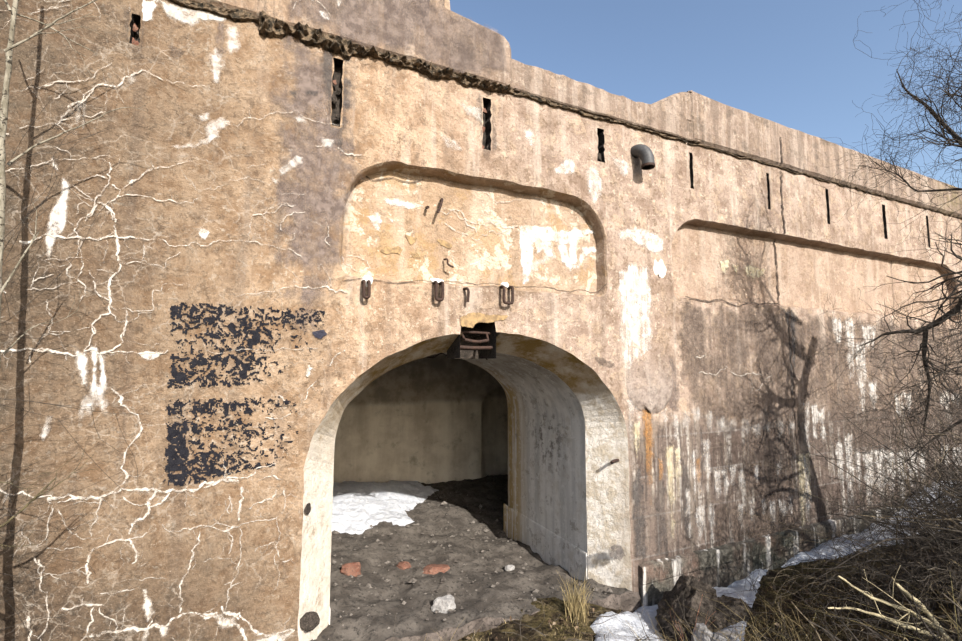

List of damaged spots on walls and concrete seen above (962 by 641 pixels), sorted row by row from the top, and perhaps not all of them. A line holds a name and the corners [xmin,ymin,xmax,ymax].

crack [0,65,606,362]
peeling [519,226,596,284]
peeling [620,228,663,252]
spalling [460,312,508,328]
efflorescence [619,265,651,361]
peeling [163,302,325,486]
crack [266,347,345,419]
damp [663,303,962,542]
crack [0,389,295,641]
damp [633,469,646,557]